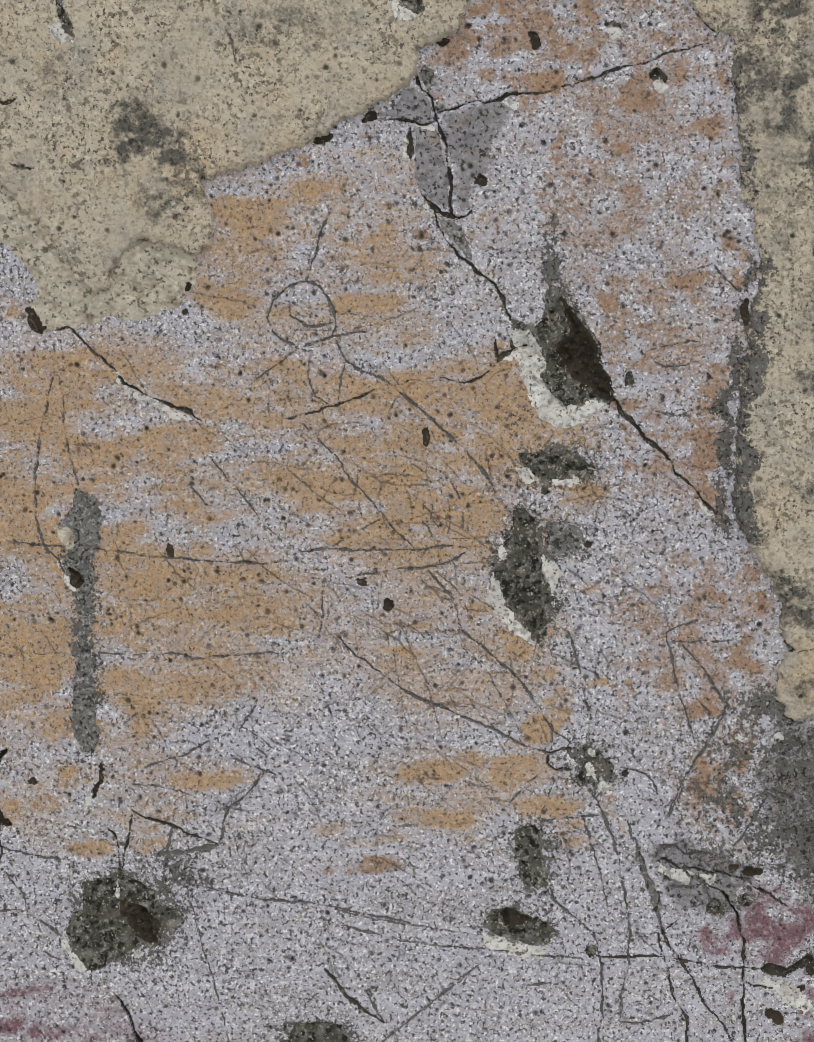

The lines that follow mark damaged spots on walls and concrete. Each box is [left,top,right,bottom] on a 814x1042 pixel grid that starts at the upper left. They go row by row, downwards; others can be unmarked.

peeling [377,64,516,260]
crack [389,43,709,384]
crack [53,326,201,421]
spalling [477,297,619,672]
crack [613,398,717,518]
crack [0,809,67,963]
spalling [43,839,216,984]
crack [108,810,219,871]
spalling [257,968,385,1042]
crack [191,822,814,1042]
spalling [465,809,576,959]
spalling [642,829,787,929]